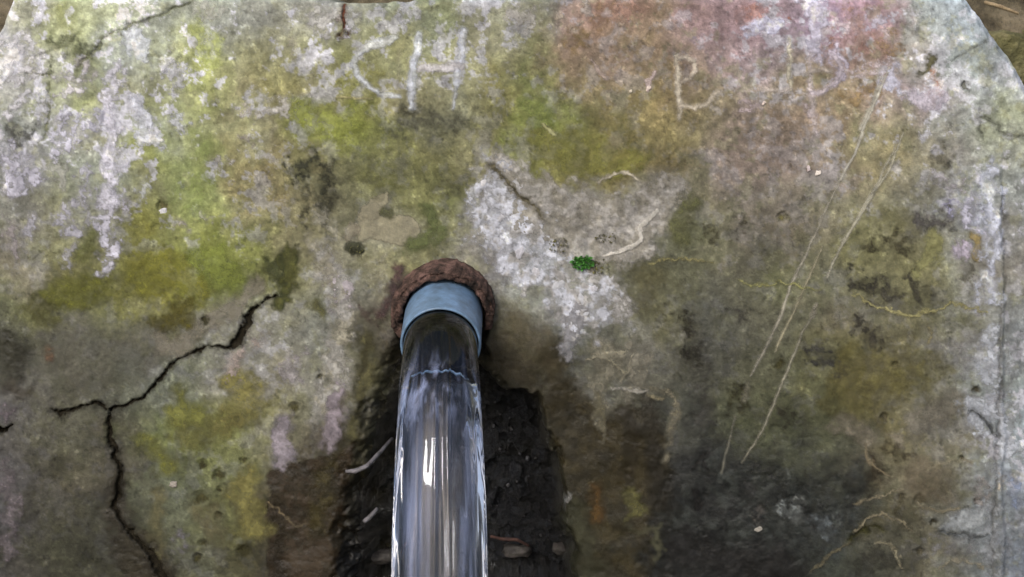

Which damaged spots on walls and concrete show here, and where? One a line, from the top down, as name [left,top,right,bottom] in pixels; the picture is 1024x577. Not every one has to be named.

crack [52,294,278,577]
water stain [266,149,355,577]